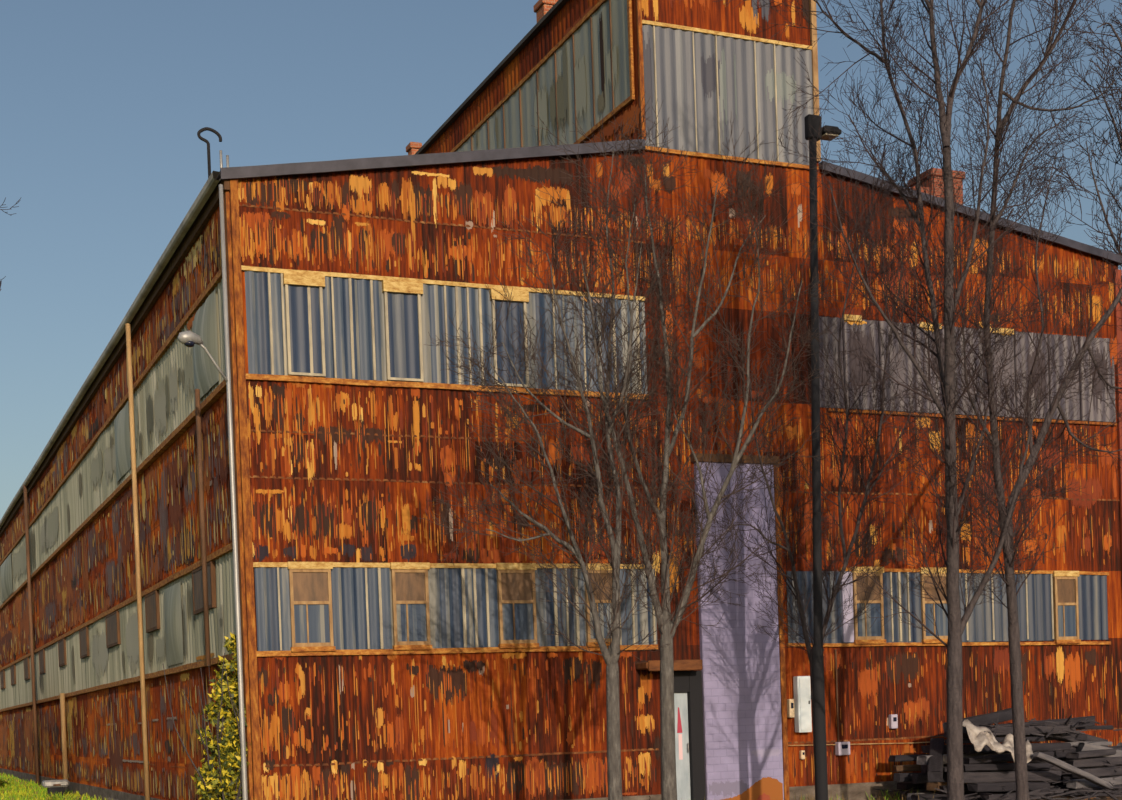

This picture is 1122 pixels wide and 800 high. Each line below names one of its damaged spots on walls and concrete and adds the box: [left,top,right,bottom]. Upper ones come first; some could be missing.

peeling [473,166,493,177]
peeling [238,171,810,301]
rust [239,168,1117,366]
peeling [1020,255,1111,326]
peeling [0,400,231,668]
rust [0,391,232,665]
peeling [248,382,628,563]
rust [247,383,1003,569]
rust [0,673,232,800]
peeling [625,752,651,791]
rust [823,648,947,782]
rust [964,645,1122,746]